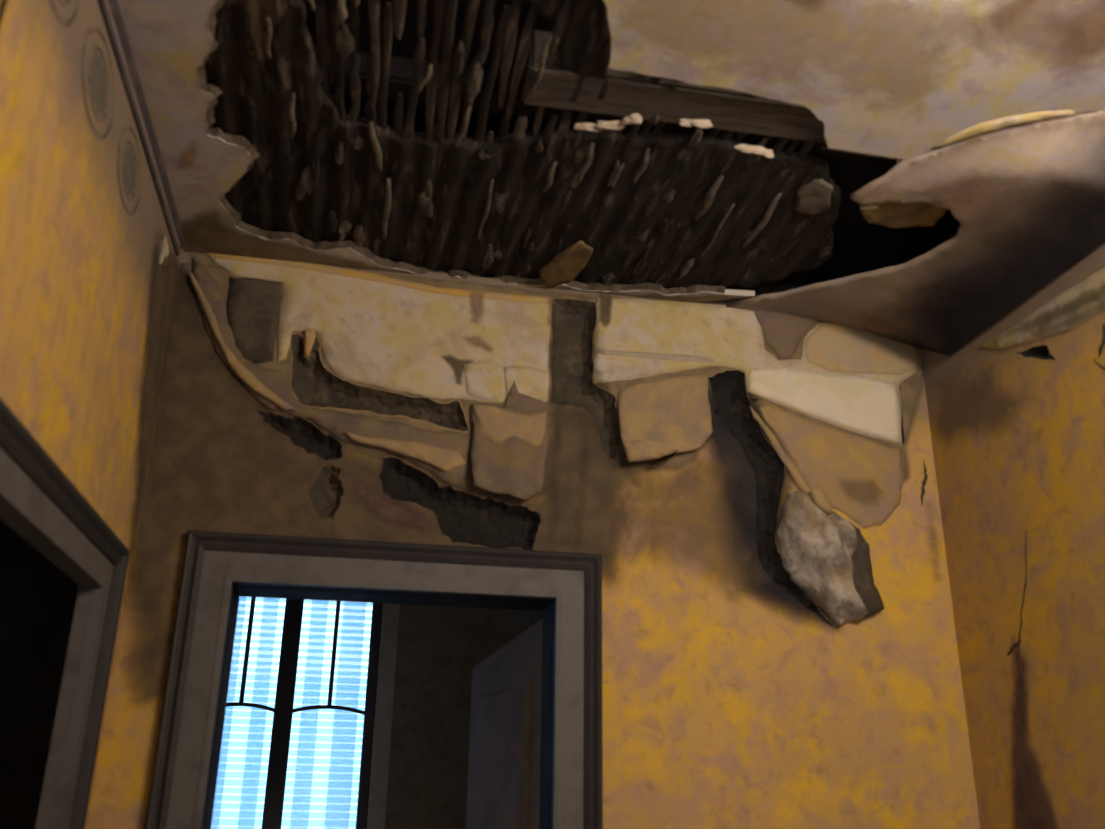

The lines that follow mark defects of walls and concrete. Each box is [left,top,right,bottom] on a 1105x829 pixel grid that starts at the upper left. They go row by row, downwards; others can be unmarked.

water stain [997,0,1105,61]
peeling [192,0,923,629]
crack [1094,324,1105,369]